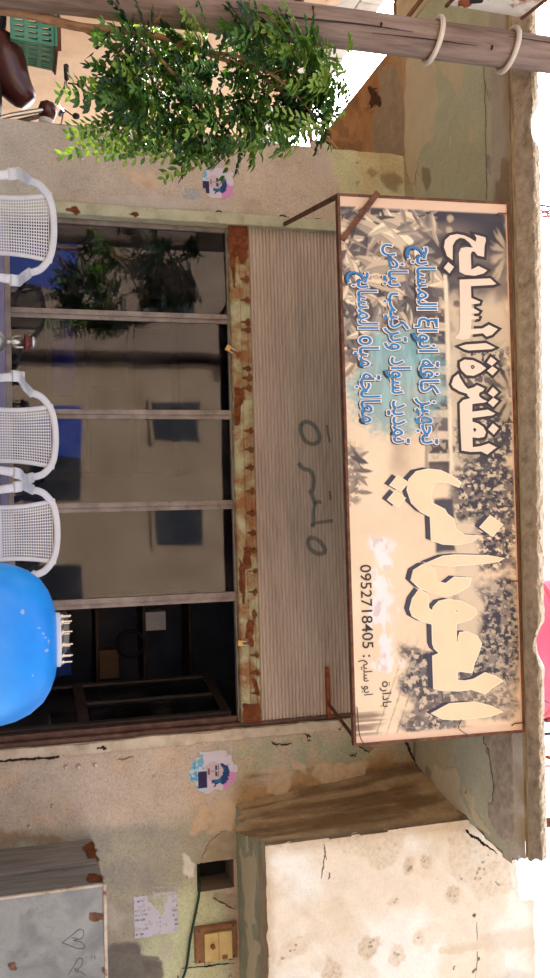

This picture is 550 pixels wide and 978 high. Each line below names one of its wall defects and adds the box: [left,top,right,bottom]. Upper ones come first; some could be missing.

corrosion [233,365,254,434]
corrosion [239,547,258,642]
corrosion [242,652,261,723]
crack [404,742,421,770]
water stain [234,754,436,843]
flaking render [401,853,434,878]
flaking render [431,733,516,907]
crack [466,830,497,854]
flaking render [357,930,426,969]